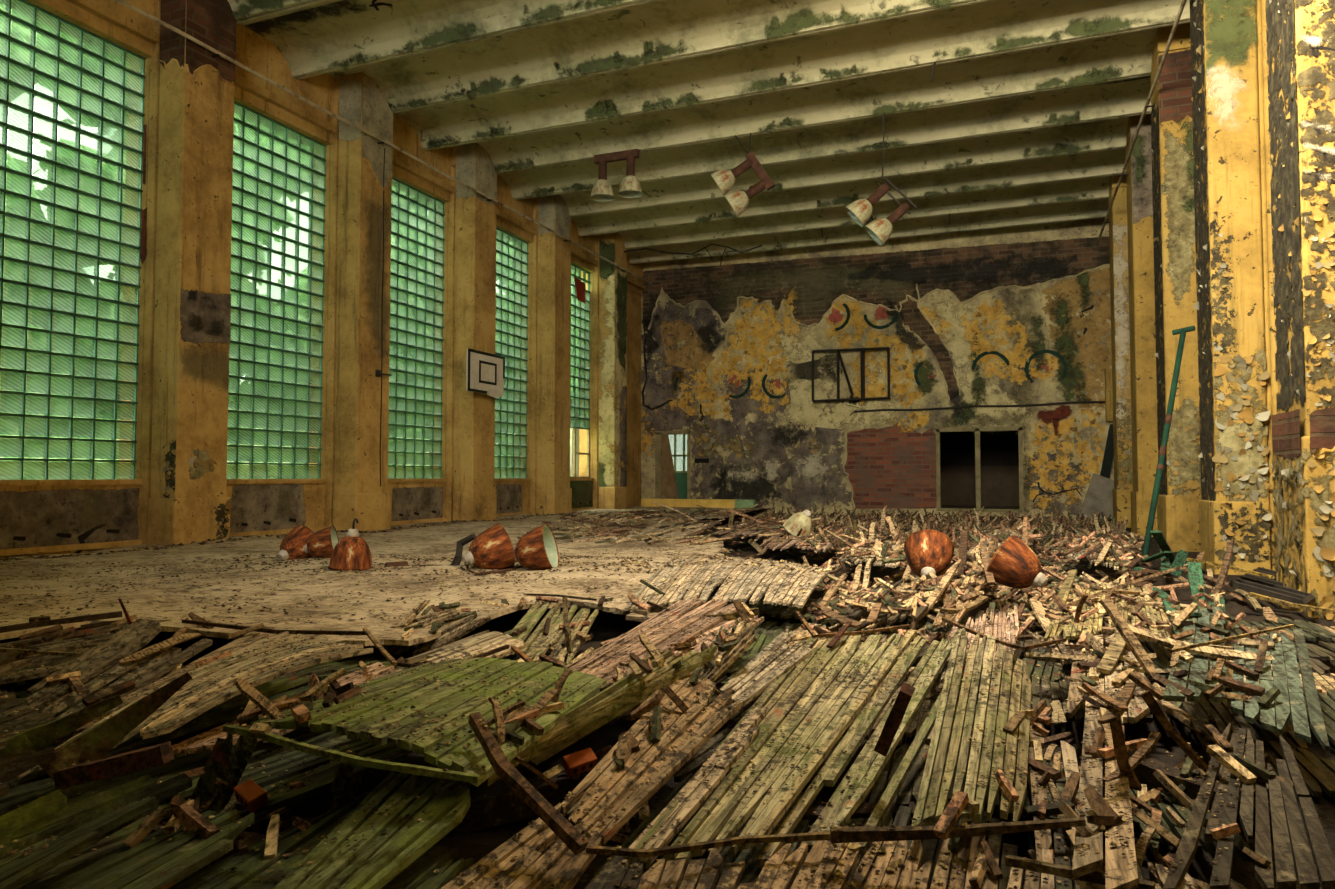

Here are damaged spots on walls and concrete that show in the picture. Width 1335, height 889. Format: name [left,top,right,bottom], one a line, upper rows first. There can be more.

flaking render [159,0,237,85]
flaking render [339,74,393,191]
flaking render [456,142,497,204]
flaking render [538,194,570,239]
flaking render [570,0,1335,621]
leakage [641,300,854,513]